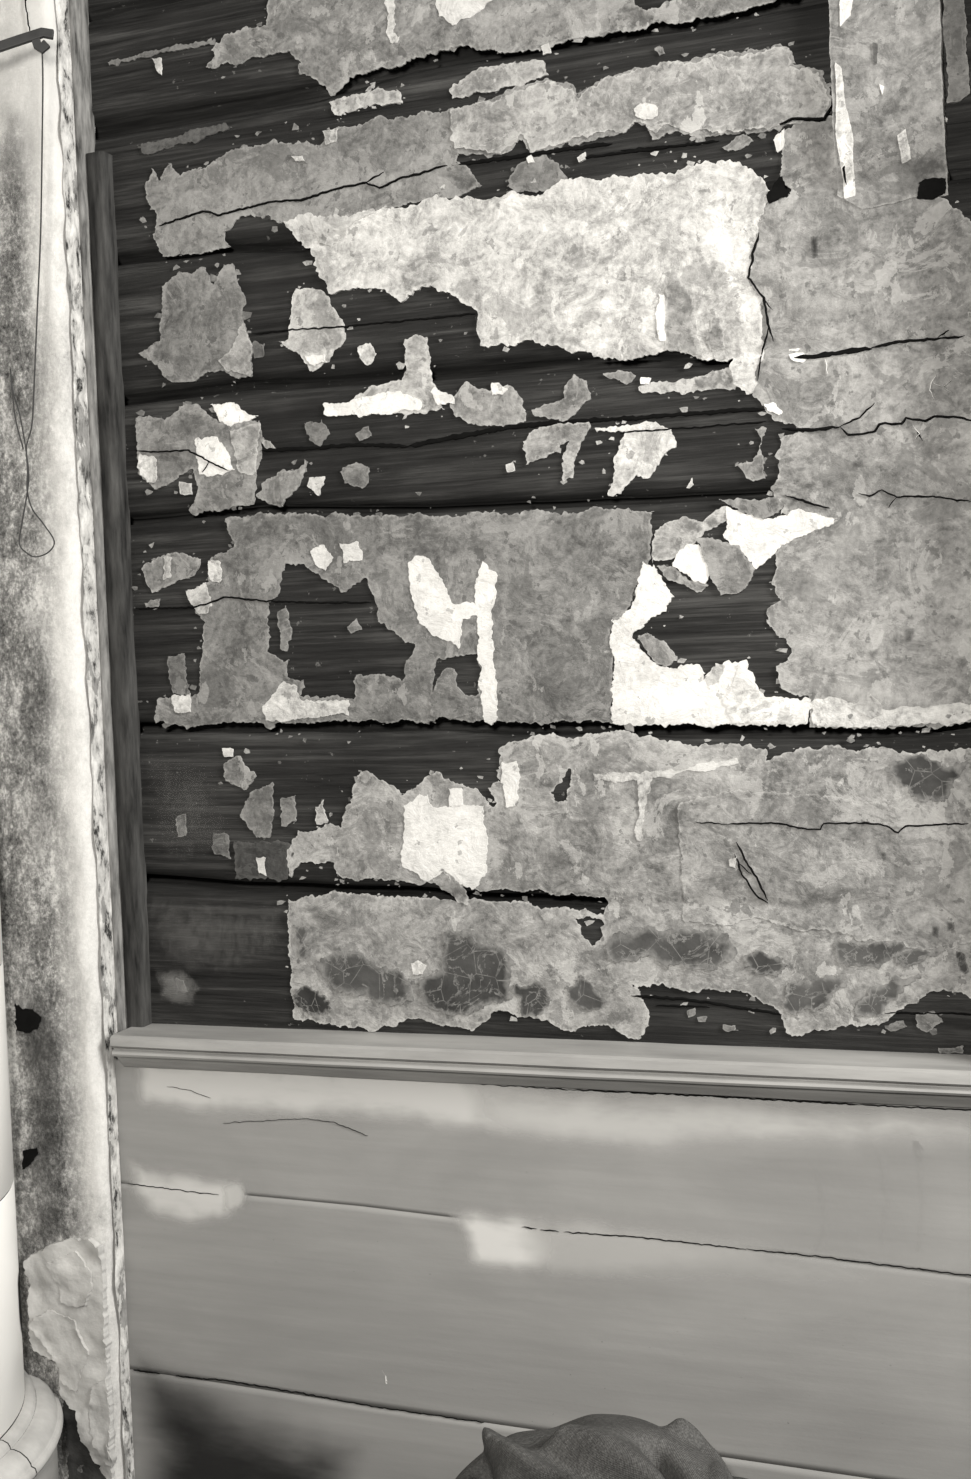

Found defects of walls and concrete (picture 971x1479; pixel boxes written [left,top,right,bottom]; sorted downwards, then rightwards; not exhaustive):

peeling [449,43,855,199]
crack [159,165,447,226]
peeling [179,402,275,495]
peeling [304,370,651,446]
crack [782,404,971,441]
crack [785,489,971,508]
peeling [652,497,834,595]
peeling [408,556,498,725]
peeling [262,681,350,722]
peeling [705,663,807,726]
peeling [400,788,488,906]
crack [697,822,968,833]